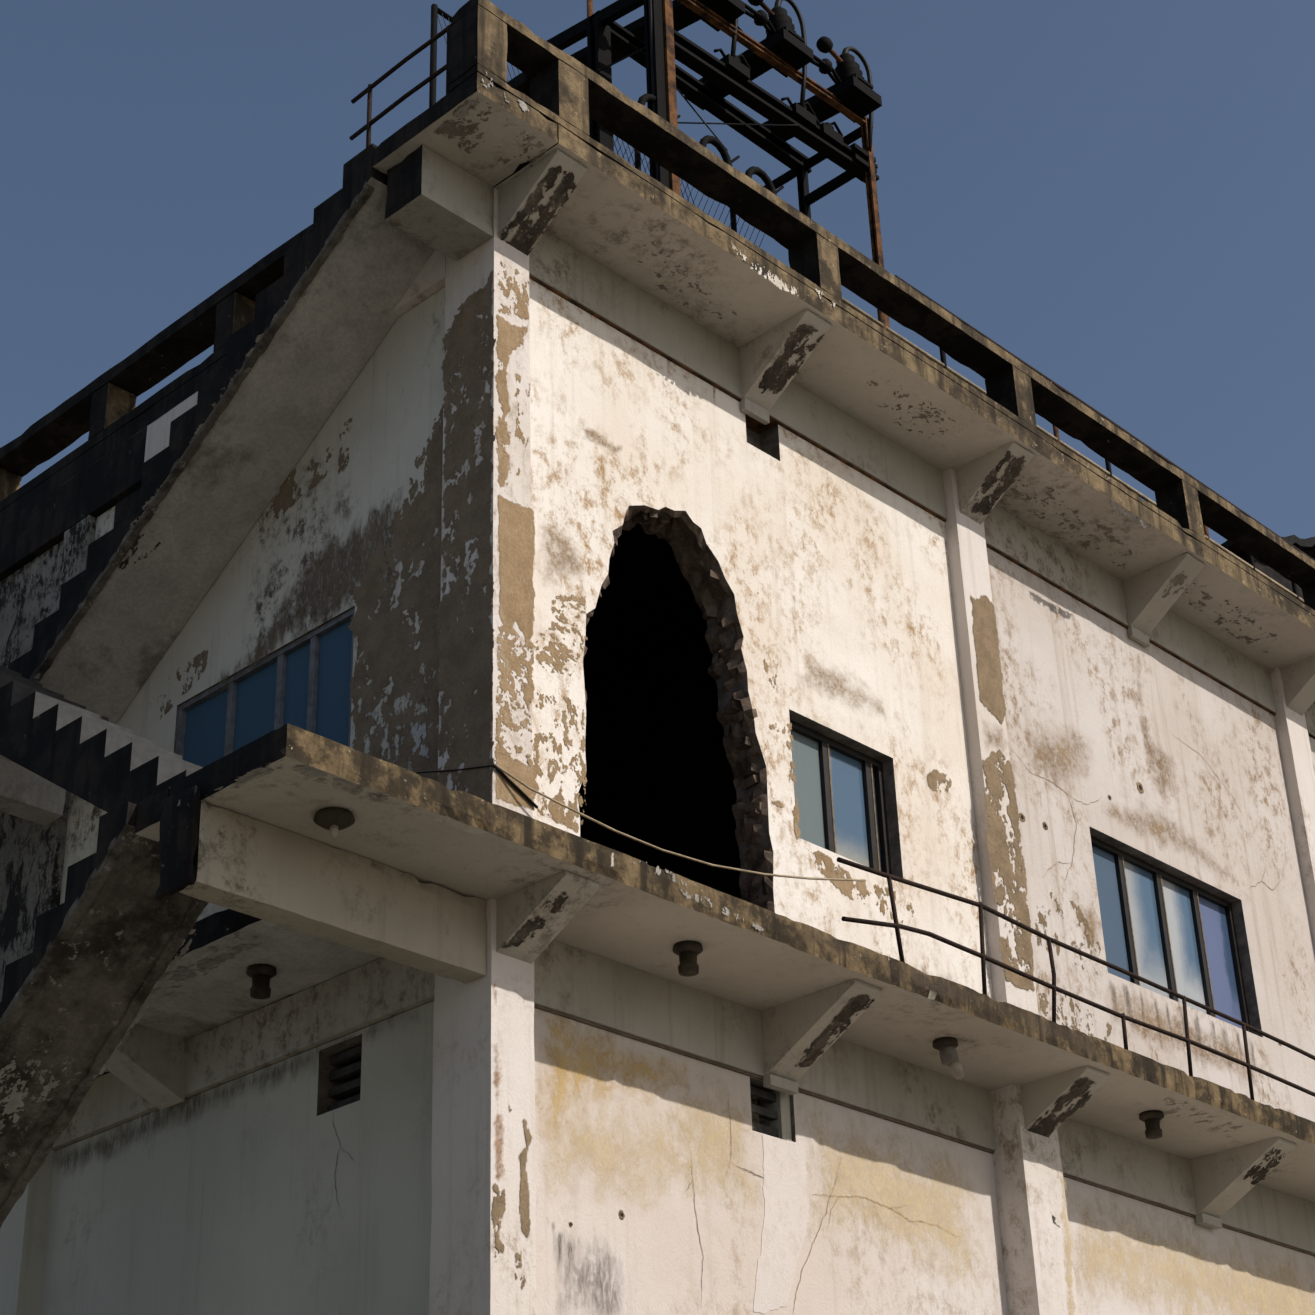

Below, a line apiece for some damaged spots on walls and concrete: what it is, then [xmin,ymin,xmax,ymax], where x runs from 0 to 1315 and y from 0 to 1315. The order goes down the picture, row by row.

peeling [434,70,577,256]
spalling [737,251,797,294]
peeling [759,324,824,394]
peeling [210,260,610,832]
peeling [150,650,208,719]
spalling [610,505,914,931]
peeling [970,595,1007,725]
damp [547,1026,657,1119]
peeling [795,994,875,1067]
peeling [1027,1078,1096,1137]
peeling [491,1105,533,1289]
crack [793,1161,961,1312]